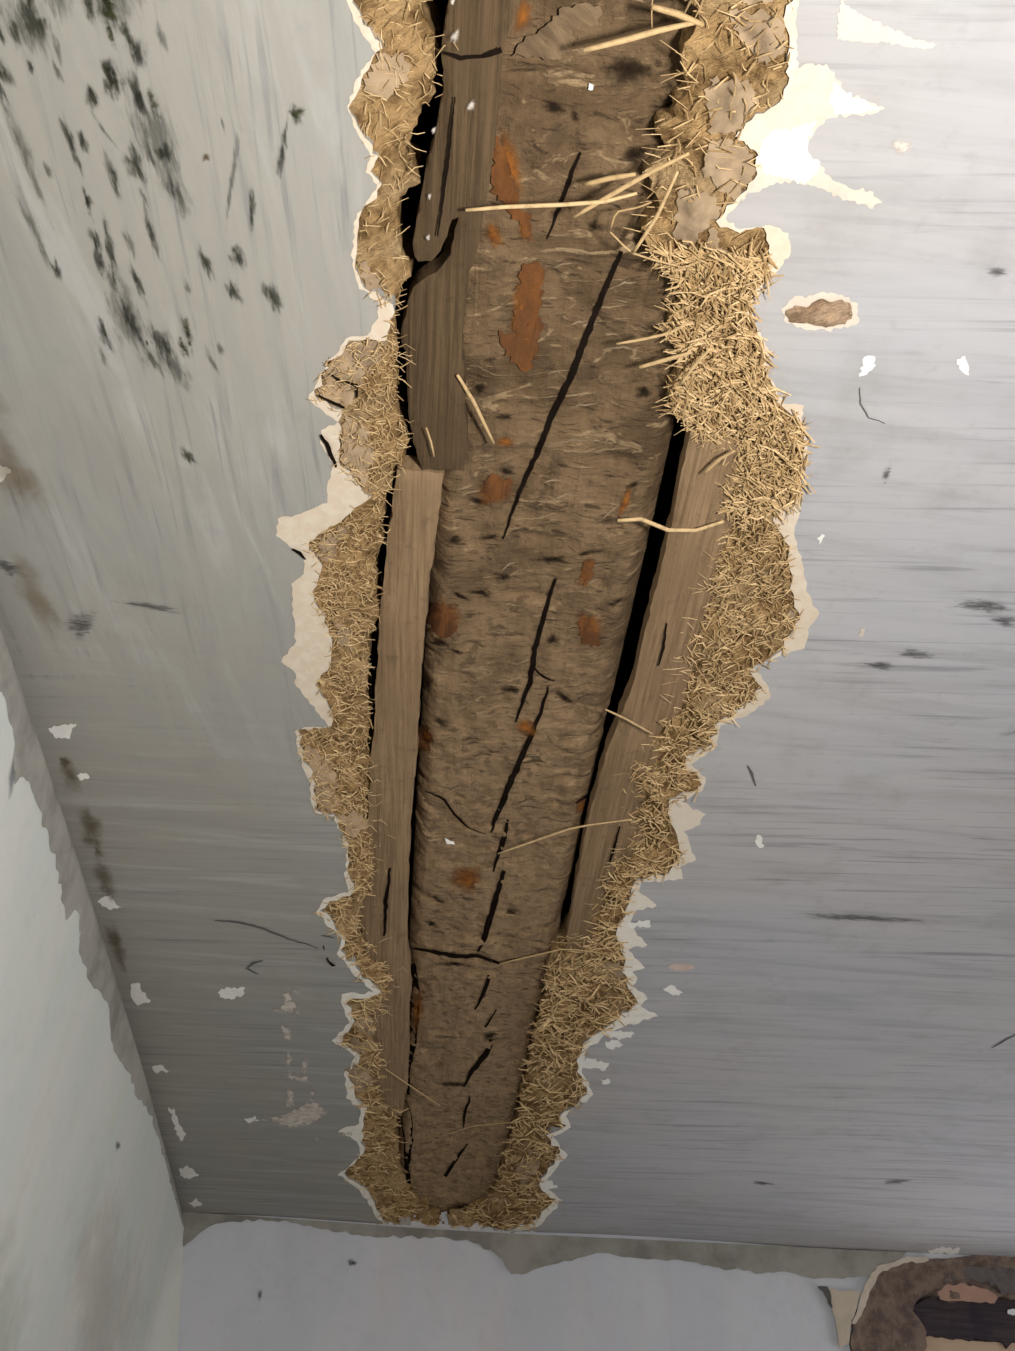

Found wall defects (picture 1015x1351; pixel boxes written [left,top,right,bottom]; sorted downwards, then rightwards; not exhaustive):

leakage [85,0,158,109]
spalling [610,60,650,79]
peeling [837,0,938,49]
leakage [60,120,87,168]
leakage [278,108,303,170]
leakage [91,222,116,282]
peeling [716,0,885,483]
leakage [124,306,191,362]
crack [502,251,623,539]
peeling [276,0,395,1069]
crack [383,578,557,1190]
peeling [0,496,1015,1351]